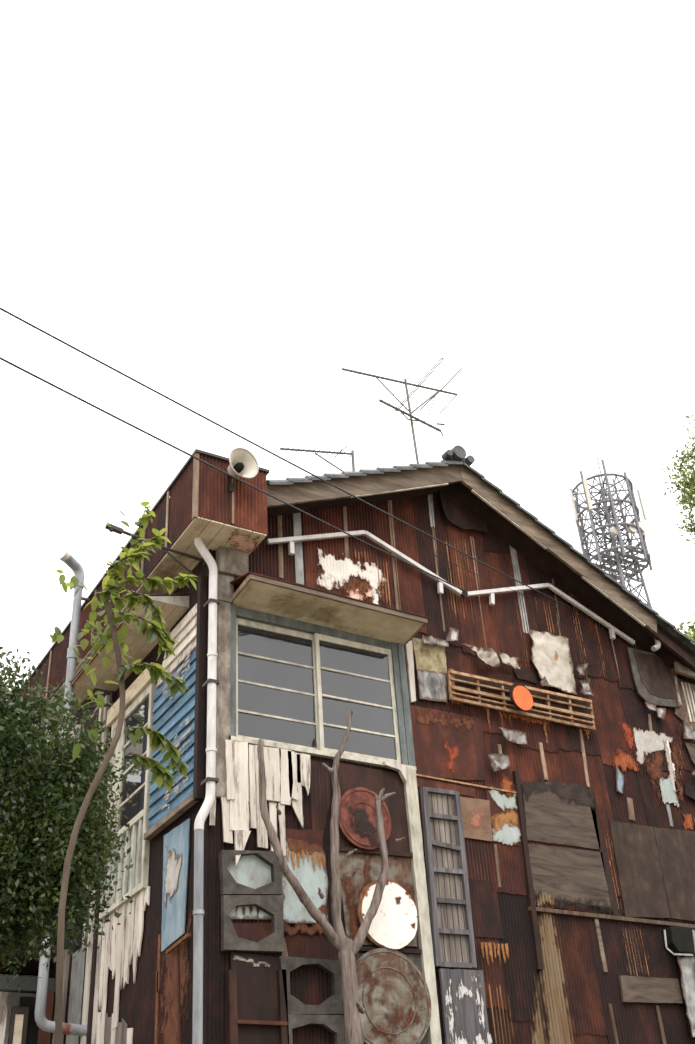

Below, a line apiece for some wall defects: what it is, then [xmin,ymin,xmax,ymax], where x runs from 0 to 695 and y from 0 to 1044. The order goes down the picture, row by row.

peeling [316,548,387,605]
rust [416,700,549,743]
rust [444,742,459,774]
rust [613,723,683,801]
peeling [633,727,679,807]
rust [683,814,694,830]
rust [342,858,372,940]
rust [367,966,423,1042]
peeling [445,976,492,1044]